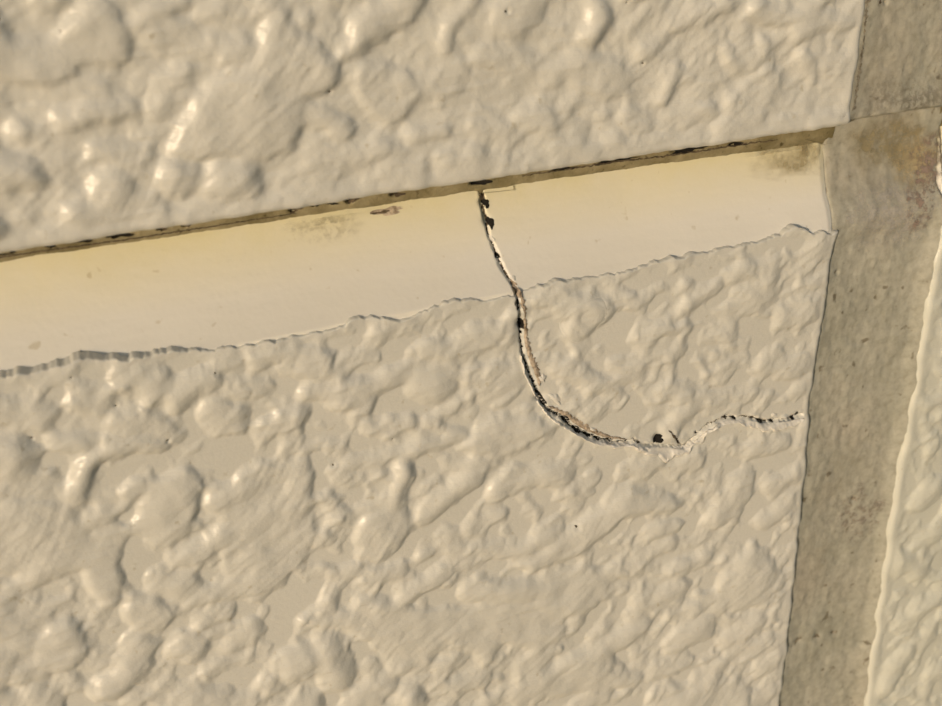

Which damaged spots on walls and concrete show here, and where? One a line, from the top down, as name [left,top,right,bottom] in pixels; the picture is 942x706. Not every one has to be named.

crack [471,180,804,463]